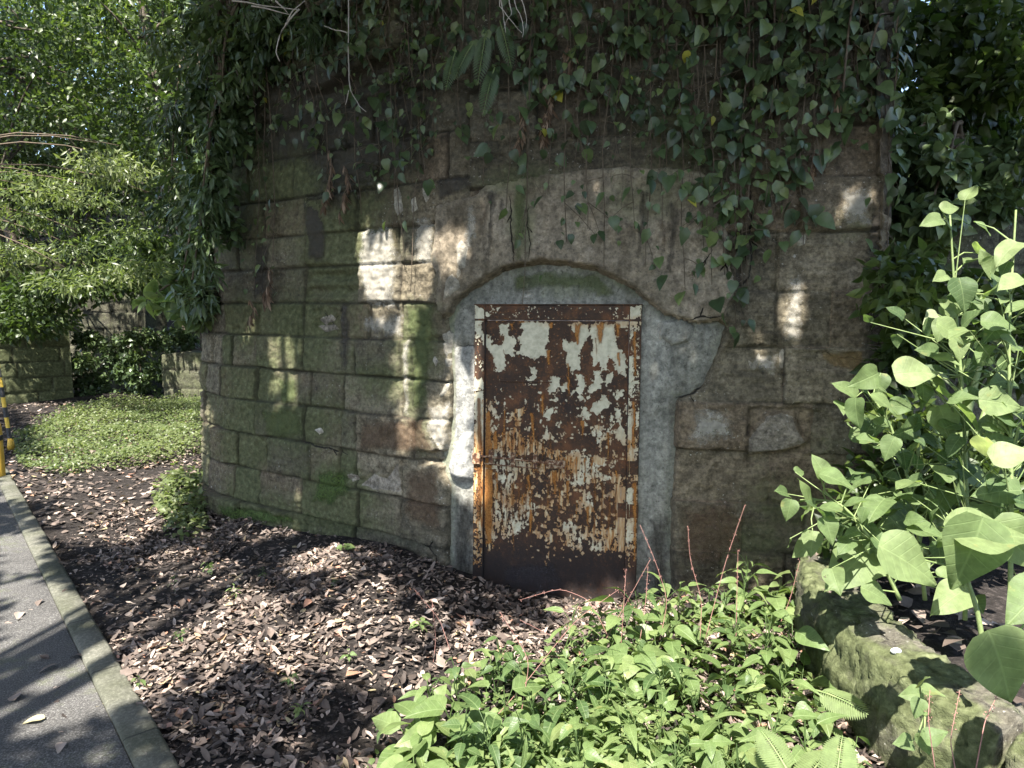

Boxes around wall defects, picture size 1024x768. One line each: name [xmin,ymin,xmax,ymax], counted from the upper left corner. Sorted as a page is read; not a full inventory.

leakage [360,230,394,305]
leakage [415,219,434,261]
leakage [365,307,431,407]
rust [595,322,620,352]
peeling [433,305,642,568]
rust [477,394,618,544]